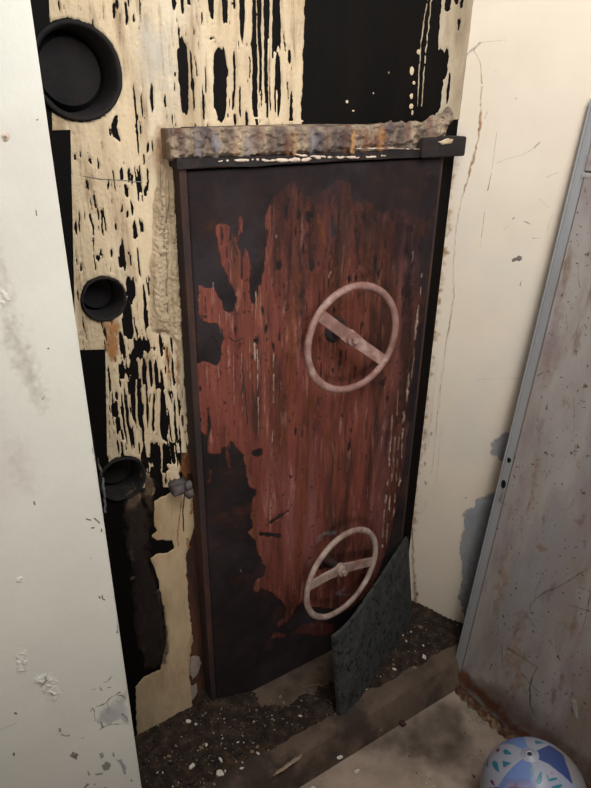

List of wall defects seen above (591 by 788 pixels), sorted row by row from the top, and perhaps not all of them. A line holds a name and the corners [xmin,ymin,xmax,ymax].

peeling [70,0,473,350]
peeling [197,206,401,636]
peeling [122,485,201,735]